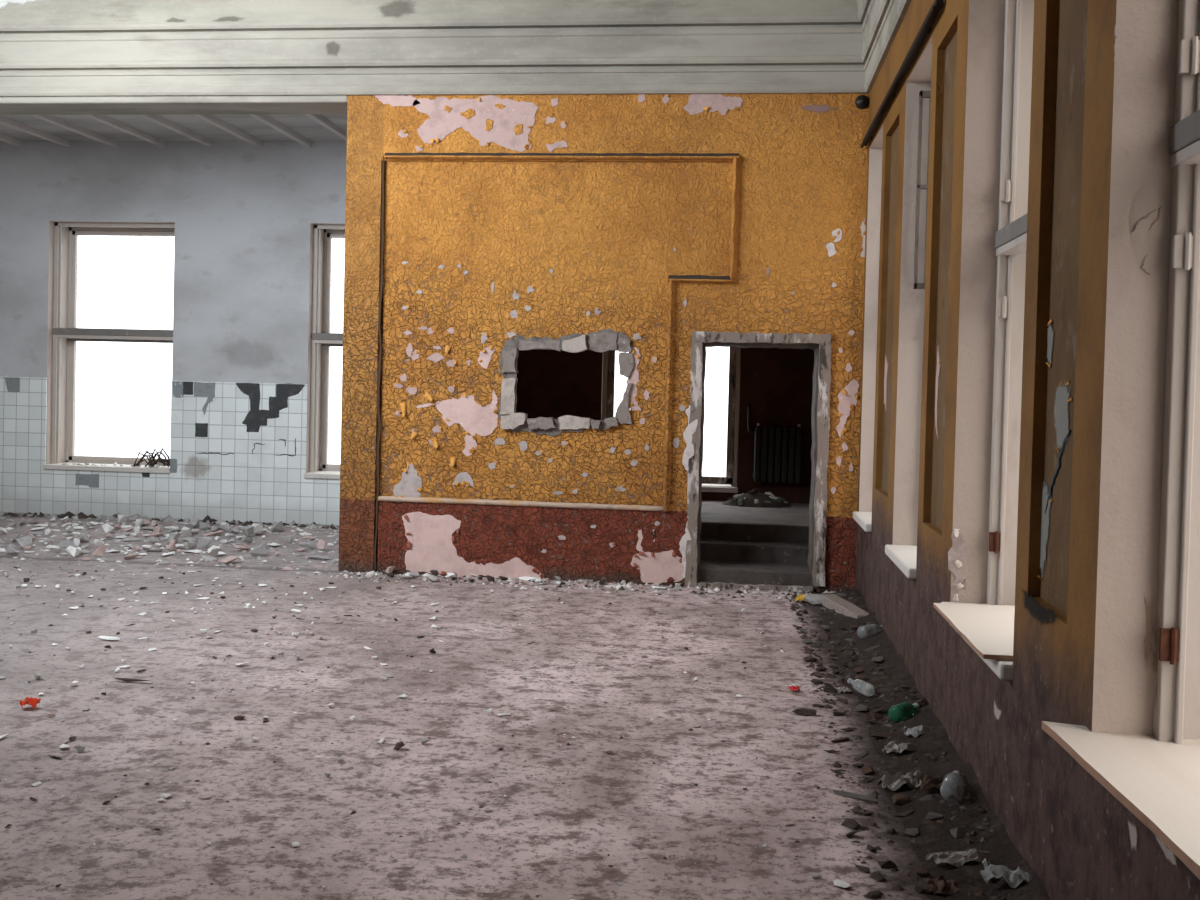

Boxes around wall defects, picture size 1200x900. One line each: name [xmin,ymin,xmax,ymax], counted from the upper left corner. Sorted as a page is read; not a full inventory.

peeling [374,95,568,153]
peeling [684,93,743,116]
peeling [826,228,842,257]
peeling [1046,319,1054,369]
peeling [5,376,20,392]
peeling [236,383,305,432]
spalling [394,285,658,487]
peeling [836,330,859,472]
peeling [1054,380,1073,453]
peeling [393,463,423,497]
flaking render [402,512,545,581]
flaking render [630,516,691,583]